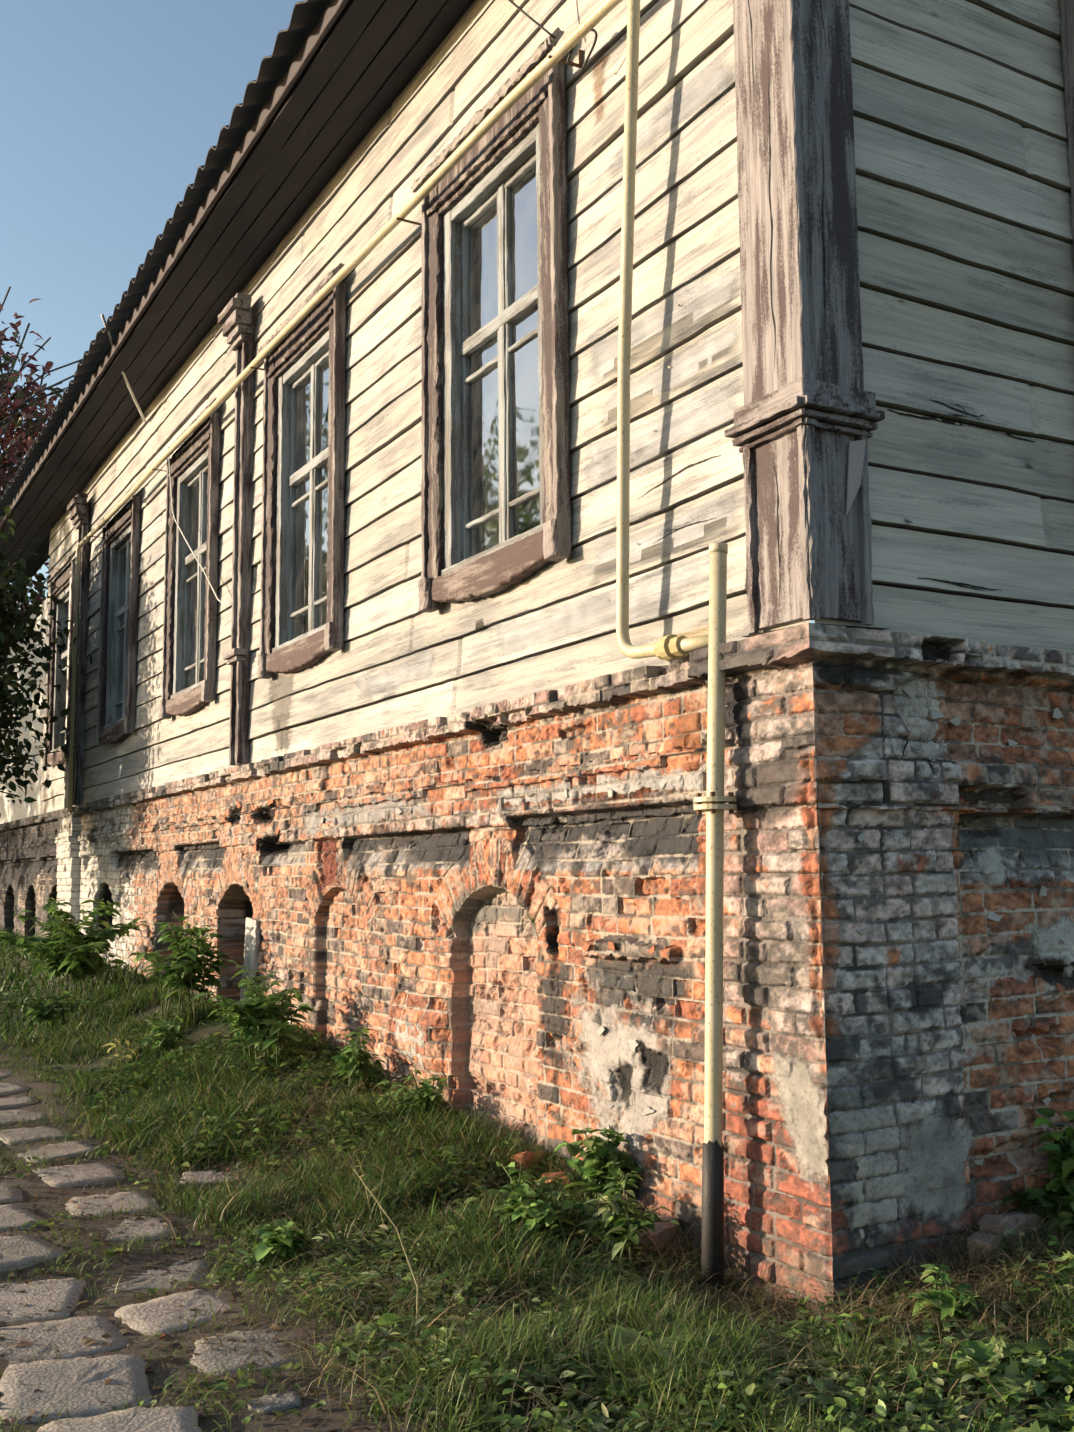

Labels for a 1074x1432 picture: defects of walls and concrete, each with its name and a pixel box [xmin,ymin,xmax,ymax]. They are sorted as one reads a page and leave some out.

crack [918,577,1000,591]
spalling [463,717,509,748]
peeling [497,763,707,815]
peeling [223,796,430,856]
spalling [796,637,1074,1043]
peeling [55,825,121,960]
spalling [544,907,559,955]
peeling [563,976,674,1168]